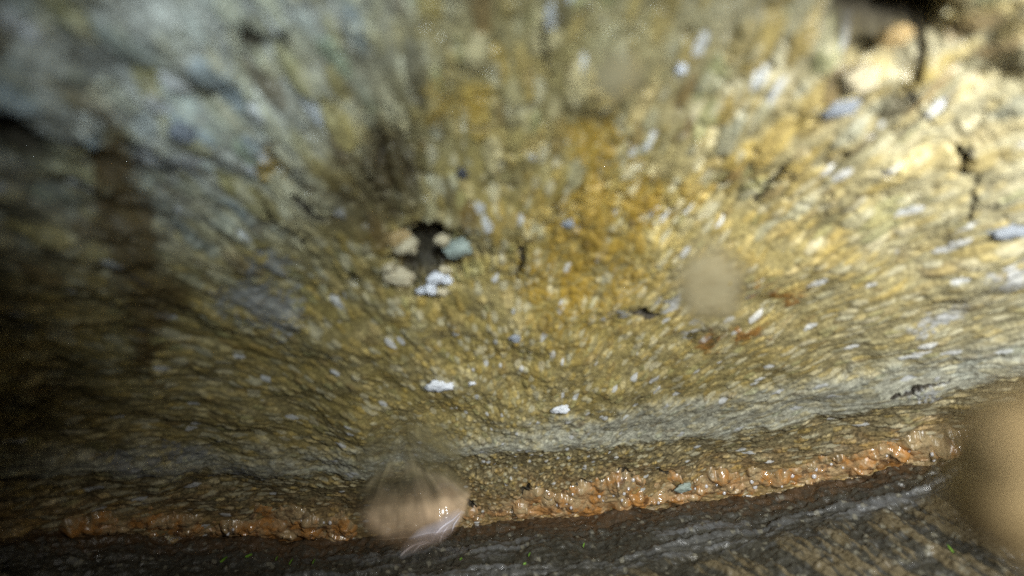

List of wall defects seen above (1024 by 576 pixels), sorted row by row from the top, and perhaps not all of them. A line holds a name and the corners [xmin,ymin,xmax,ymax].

crack [966,172,980,220]
spalling [381,221,473,297]
rust [462,429,949,522]
rust [58,503,358,542]